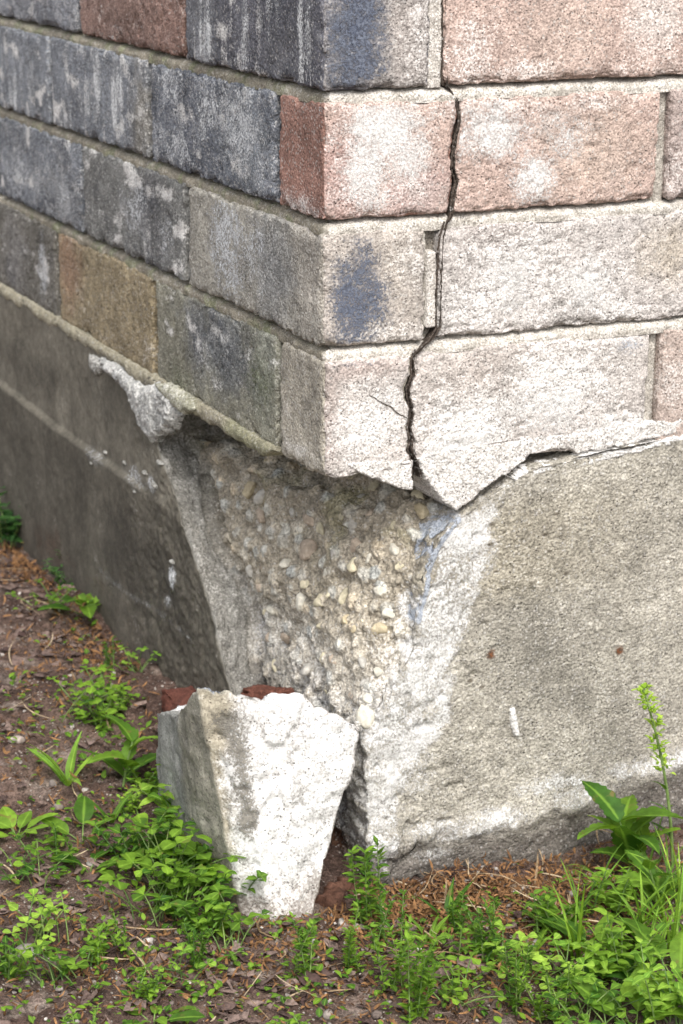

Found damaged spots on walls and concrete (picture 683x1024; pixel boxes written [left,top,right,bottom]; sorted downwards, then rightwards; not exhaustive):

crack [370,0,461,479]
peeling [0,548,117,708]
peeling [103,700,147,721]
spalling [122,413,581,881]
peeling [0,899,45,943]
peeling [44,985,98,1017]
peeling [27,822,125,959]
peeling [102,884,484,1024]
peeling [495,898,565,978]